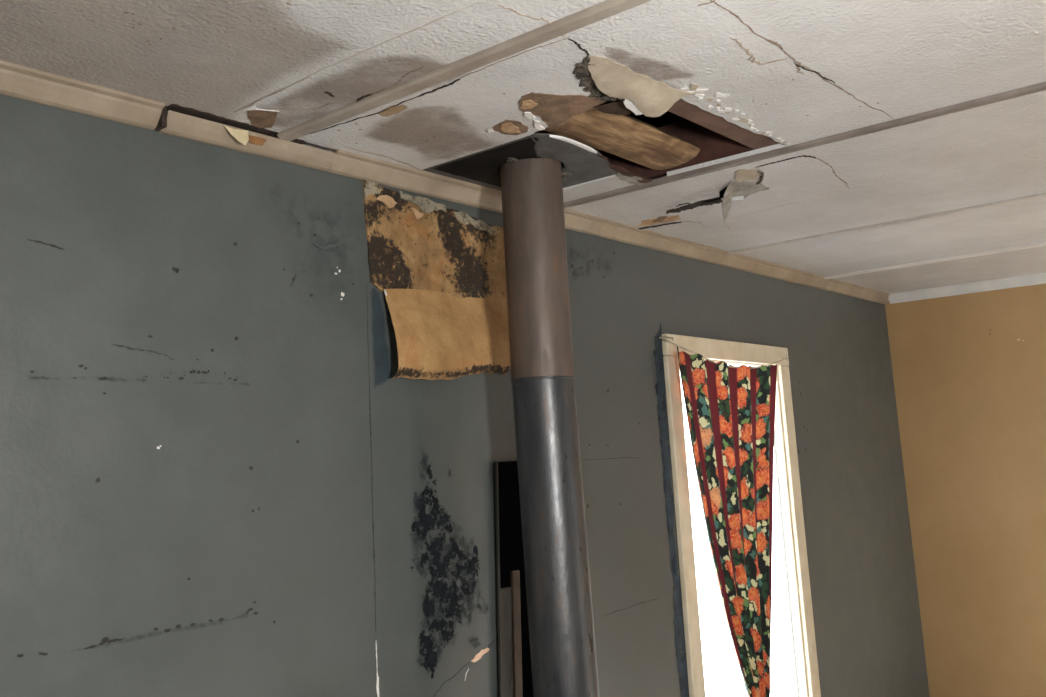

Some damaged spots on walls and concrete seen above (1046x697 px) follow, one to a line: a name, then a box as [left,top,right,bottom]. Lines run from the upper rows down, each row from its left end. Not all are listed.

crack [698,0,894,120]
peeling [525,112,545,130]
peeling [681,84,790,145]
damp [411,455,488,679]
peeling [434,638,497,697]